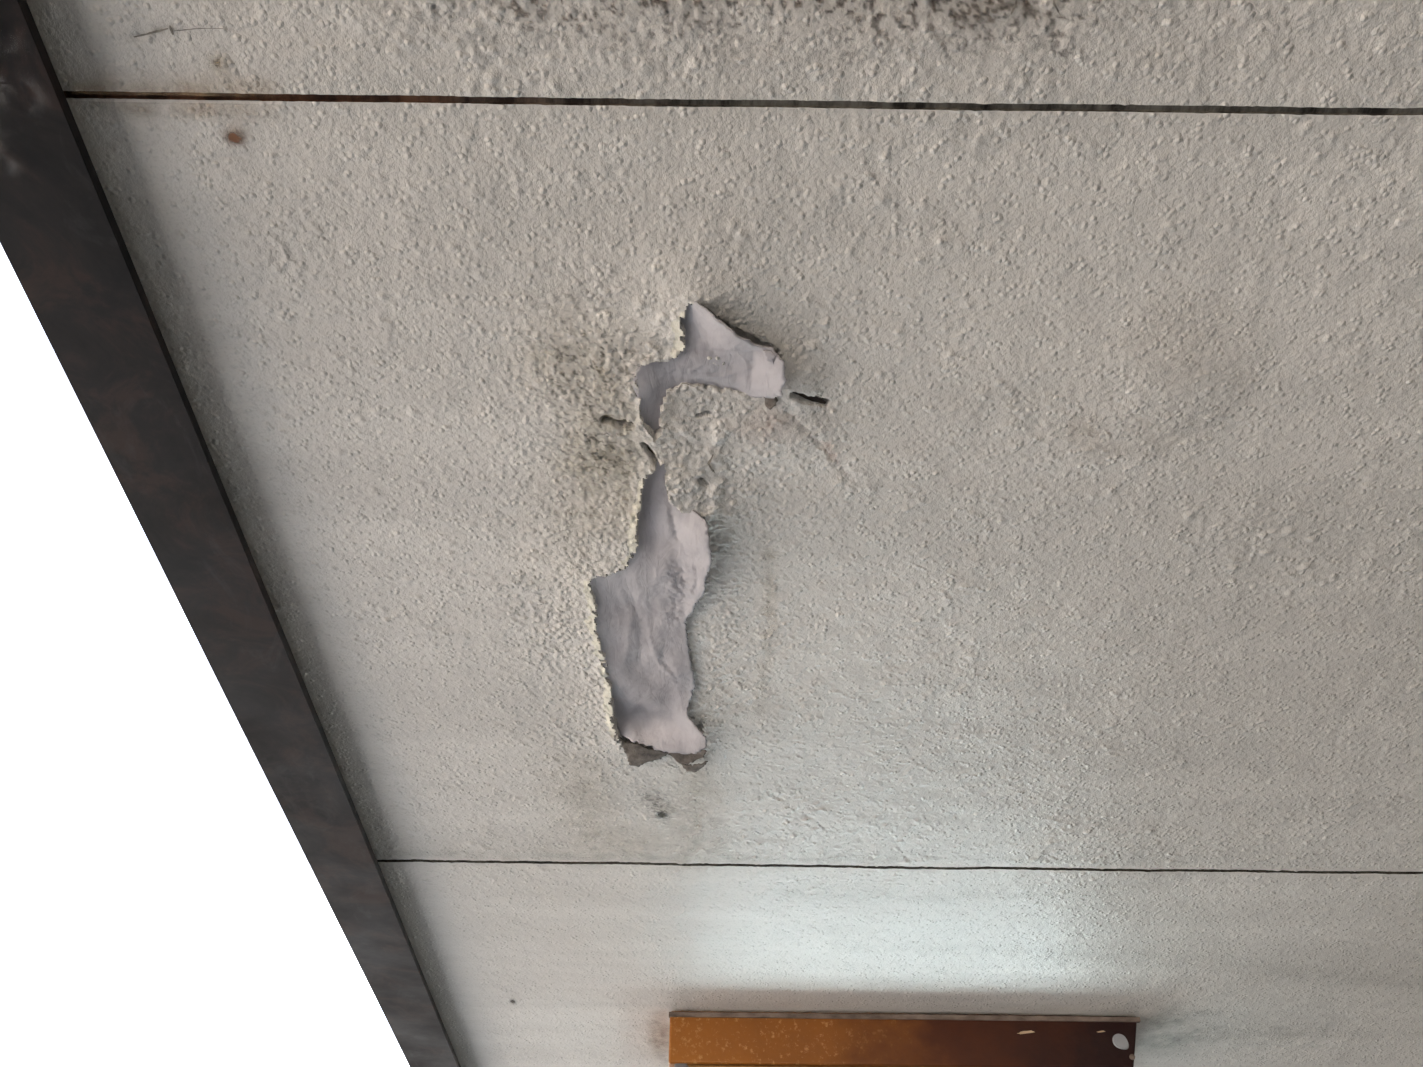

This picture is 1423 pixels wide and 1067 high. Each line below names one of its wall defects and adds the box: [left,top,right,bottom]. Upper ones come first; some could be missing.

leakage [912,0,1035,28]
peeling [633,301,787,433]
peeling [583,459,713,772]